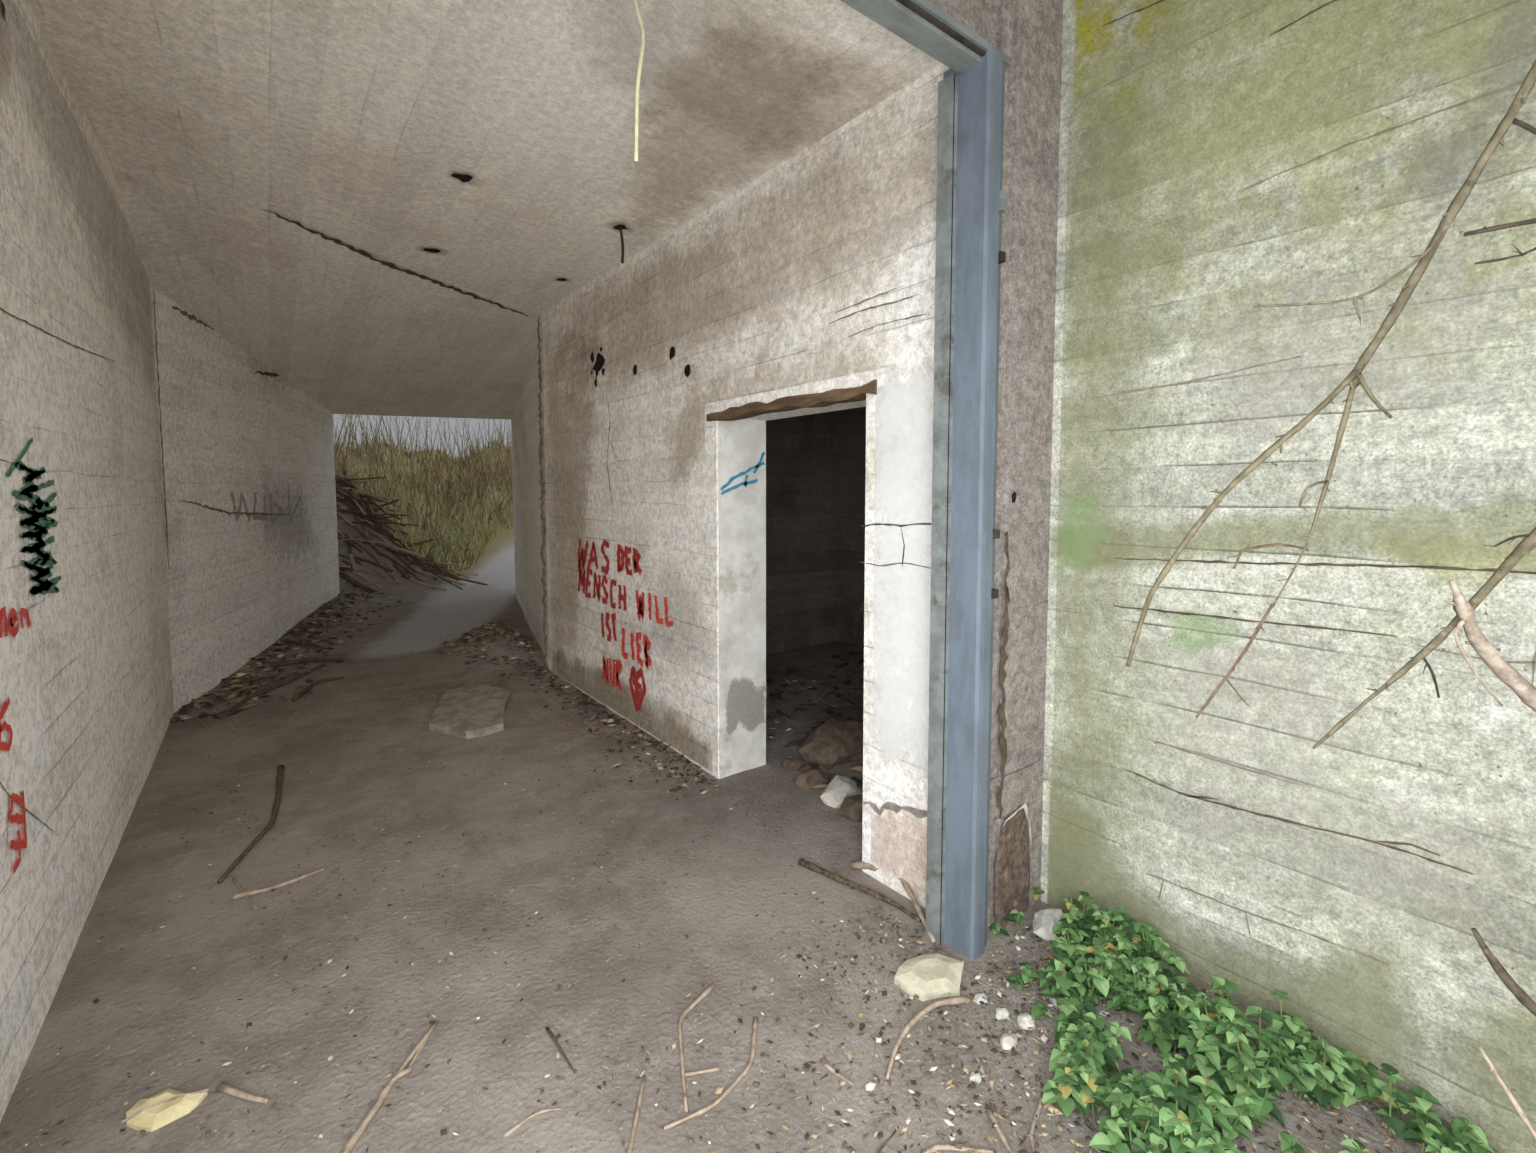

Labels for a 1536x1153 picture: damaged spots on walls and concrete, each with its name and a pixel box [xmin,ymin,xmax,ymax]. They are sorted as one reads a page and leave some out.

spalling [726,679,766,734]
crack [997,532,1010,819]
spalling [995,803,1032,928]